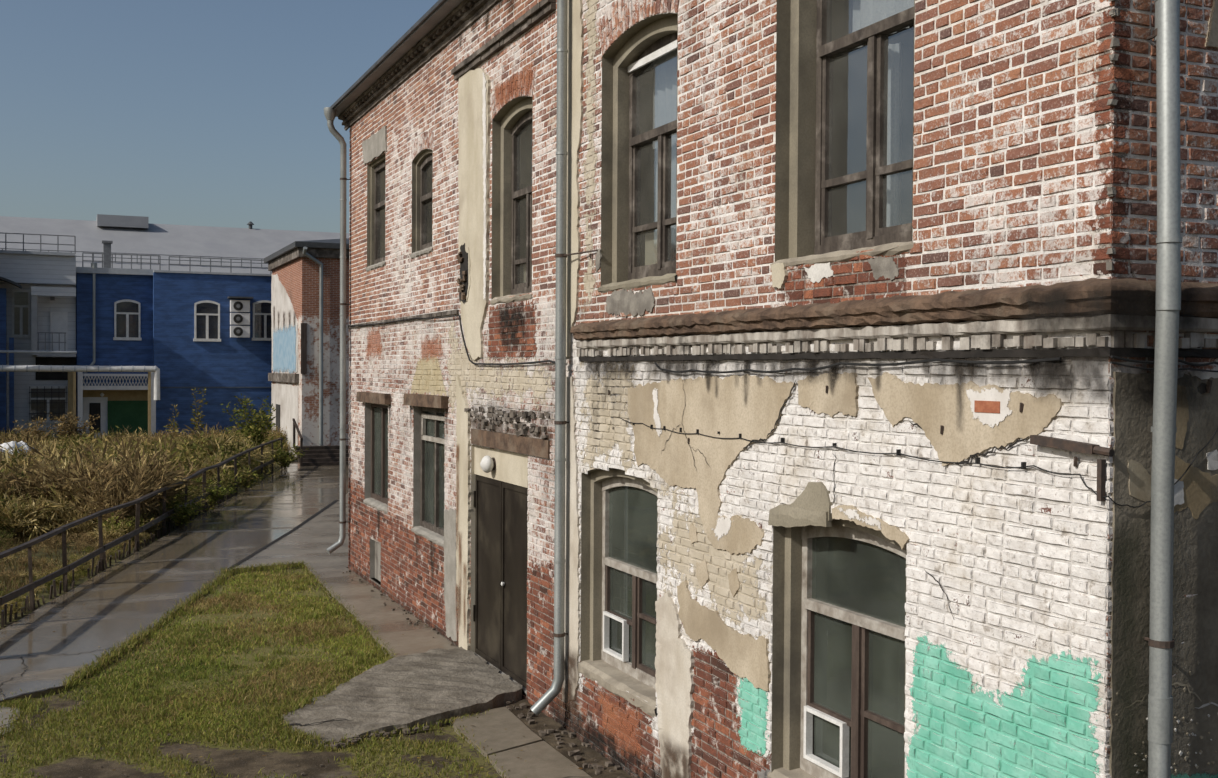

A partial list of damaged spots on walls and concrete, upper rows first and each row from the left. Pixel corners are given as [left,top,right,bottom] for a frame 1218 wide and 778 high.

damp [1025,287,1156,329]
damp [1179,296,1194,330]
damp [653,360,717,390]
flaking render [348,0,1064,778]
damp [735,359,855,387]
damp [943,351,1104,402]
damp [1131,355,1155,401]
flaking render [1174,370,1218,520]
flaking render [1127,460,1151,506]
crack [0,647,113,727]
peeling [906,634,1102,778]
flaking render [1171,702,1218,778]